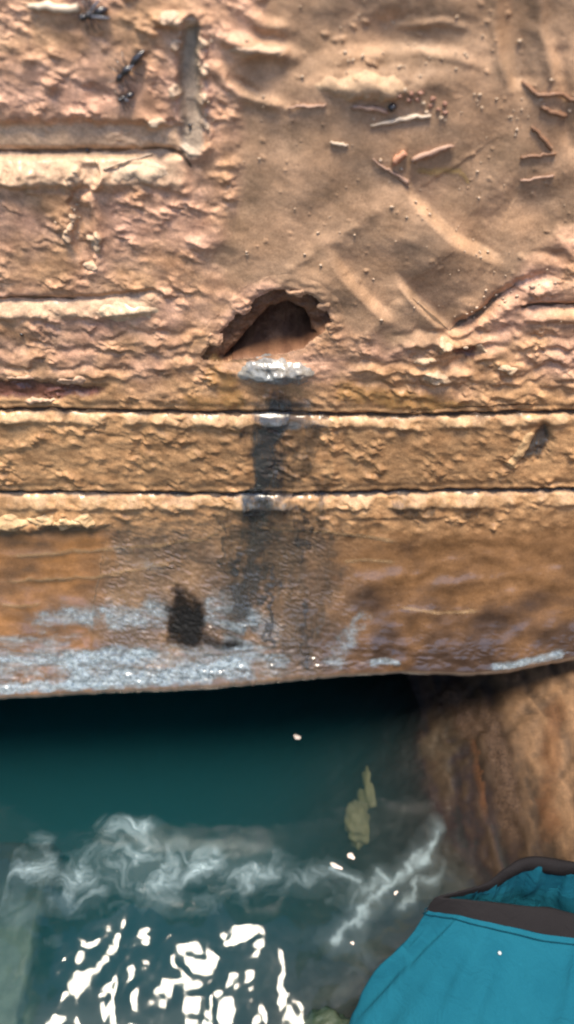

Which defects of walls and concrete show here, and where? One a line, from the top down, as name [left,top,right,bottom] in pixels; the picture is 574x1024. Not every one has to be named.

spalling [201,289,335,363]
damp [231,392,391,646]
damp [0,585,246,695]
damp [496,652,562,669]